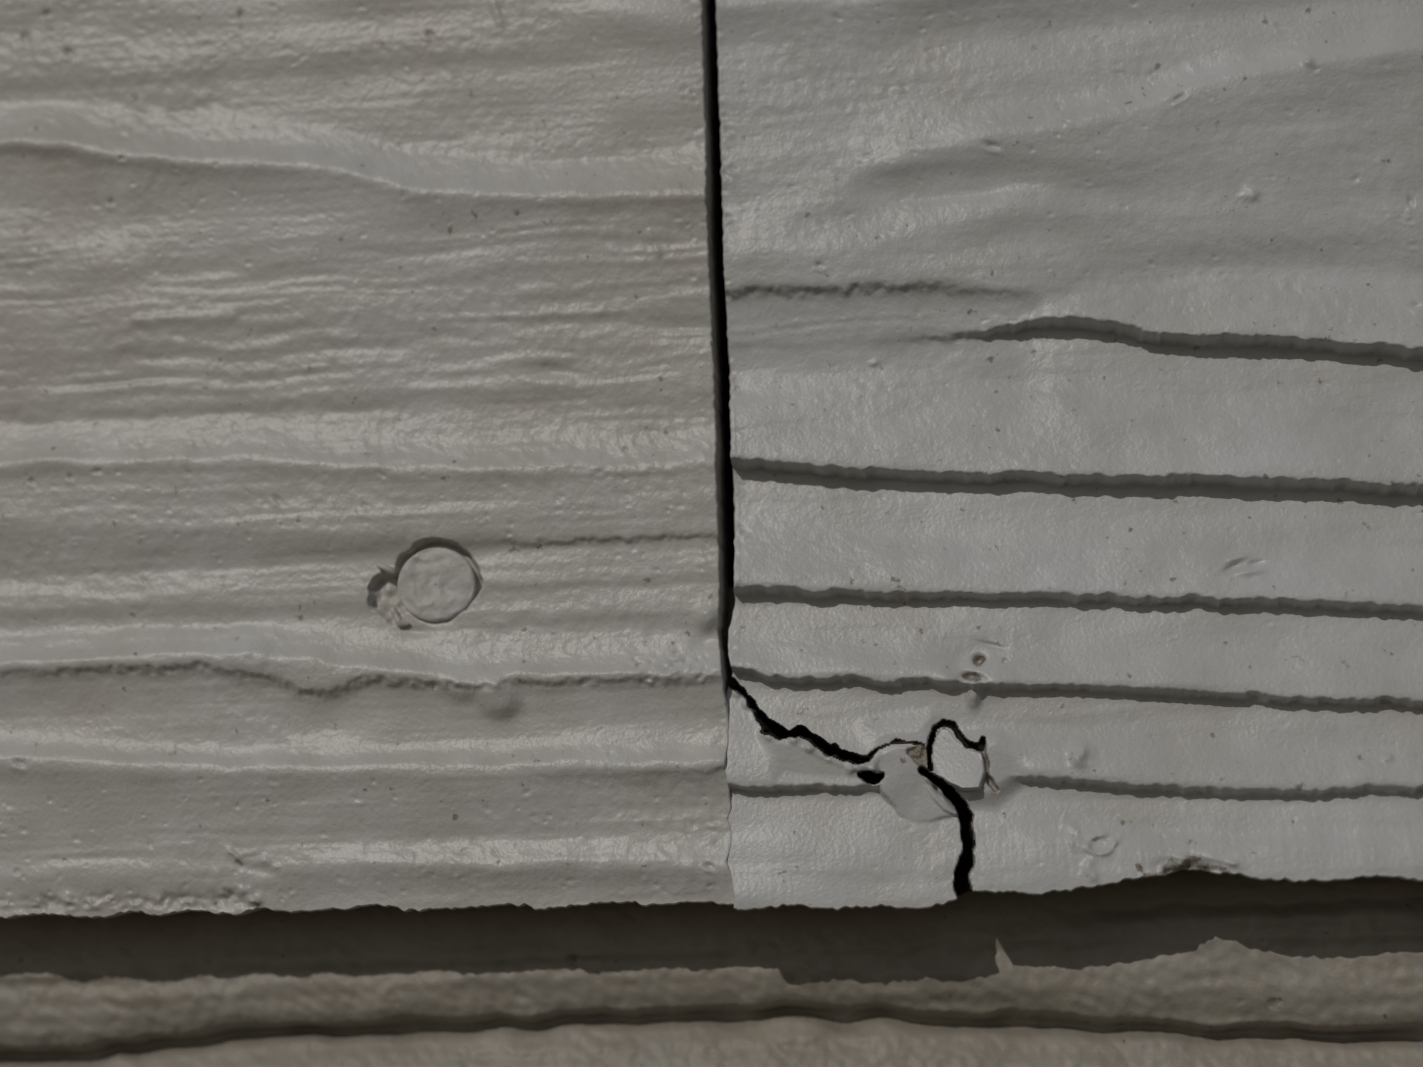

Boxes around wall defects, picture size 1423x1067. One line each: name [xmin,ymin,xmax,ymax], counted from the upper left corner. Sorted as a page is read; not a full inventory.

crack [729,676,976,896]